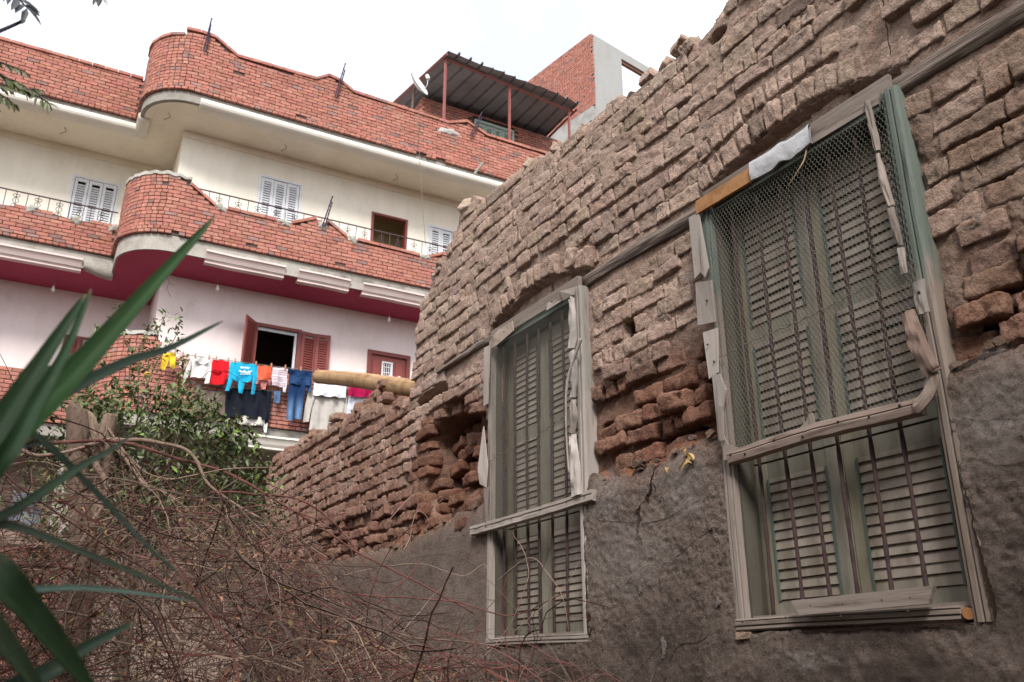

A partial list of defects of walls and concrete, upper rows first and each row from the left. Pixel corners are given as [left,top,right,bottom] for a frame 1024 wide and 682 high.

spalling [624,429,718,476]
crack [598,466,701,545]